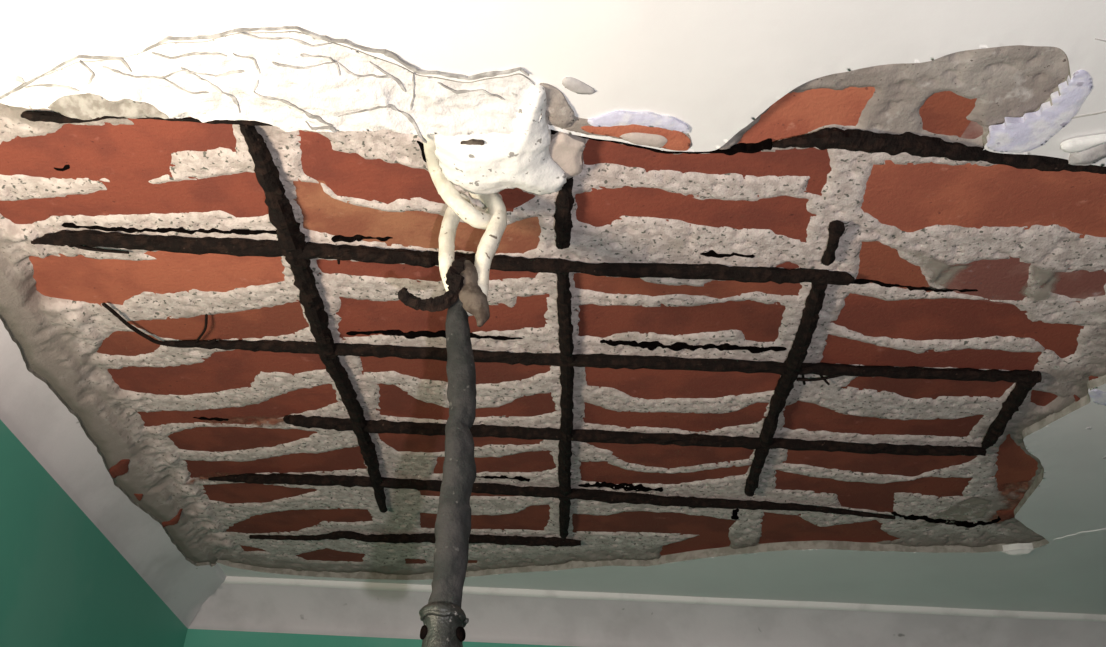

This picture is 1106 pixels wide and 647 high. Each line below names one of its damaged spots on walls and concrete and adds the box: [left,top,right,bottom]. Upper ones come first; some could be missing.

crack [1072,111,1106,119]
flaking render [453,184,487,212]
flaking render [454,219,486,254]
flaking render [0,103,449,575]
corrosion [459,260,490,327]
flaking render [466,45,1106,572]